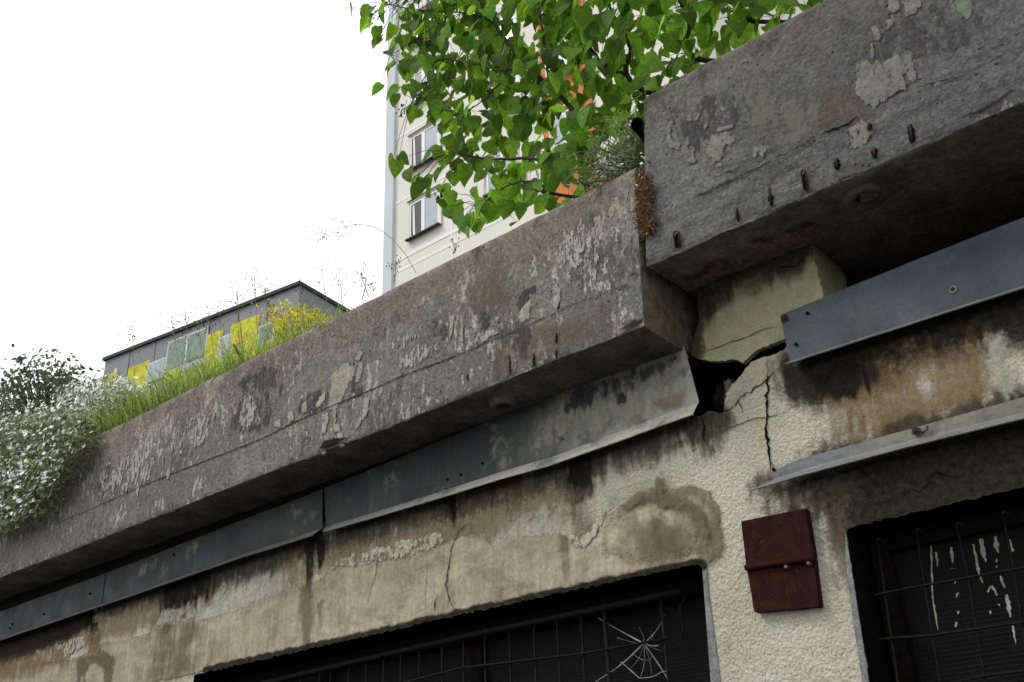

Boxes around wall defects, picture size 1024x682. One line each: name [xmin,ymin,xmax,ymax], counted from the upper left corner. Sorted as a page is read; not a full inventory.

peeling [852,0,921,108]
peeling [664,113,735,180]
peeling [551,225,603,309]
peeling [100,409,215,497]
peeling [274,350,369,456]
damp [534,360,683,449]
crack [701,359,788,469]
corrosion [831,340,990,445]
efflorescence [987,335,1012,399]
damp [4,472,583,682]
crack [425,493,493,616]
damp [568,470,719,558]